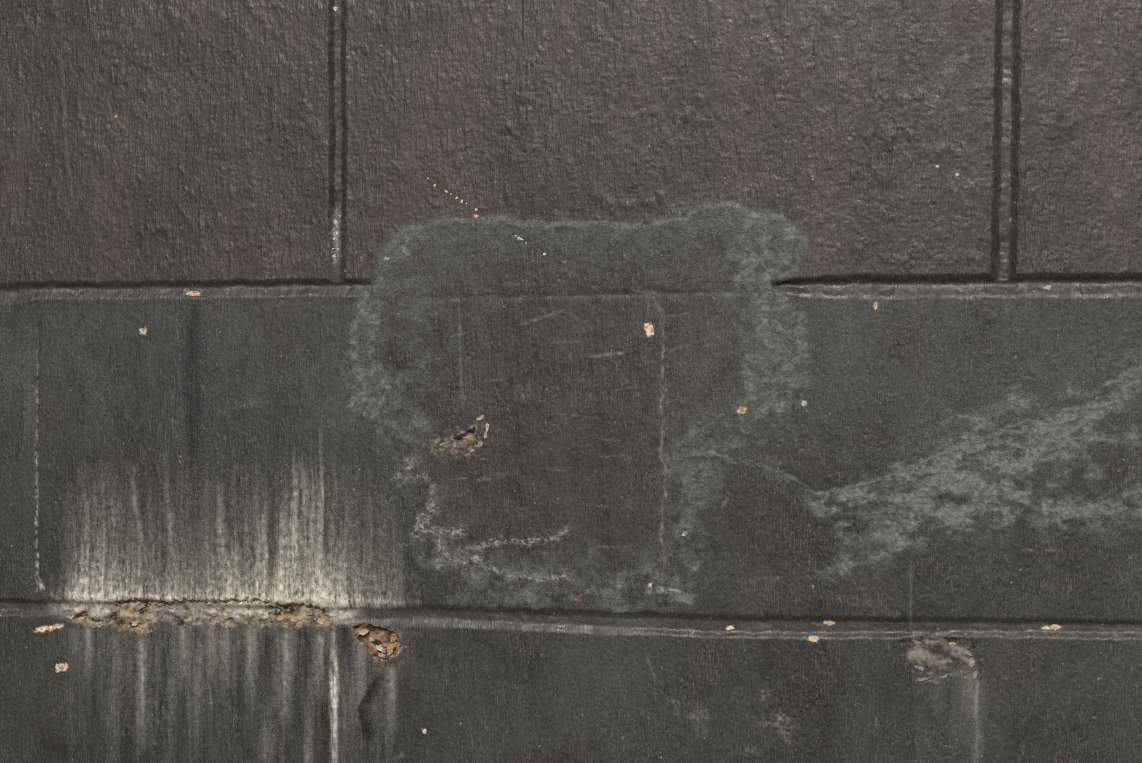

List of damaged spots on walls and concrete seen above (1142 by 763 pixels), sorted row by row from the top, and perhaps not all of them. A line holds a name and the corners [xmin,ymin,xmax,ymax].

spalling [430,415,490,457]
spalling [34,596,332,636]
water stain [64,504,396,763]
spalling [351,621,403,661]
spalling [902,636,979,682]